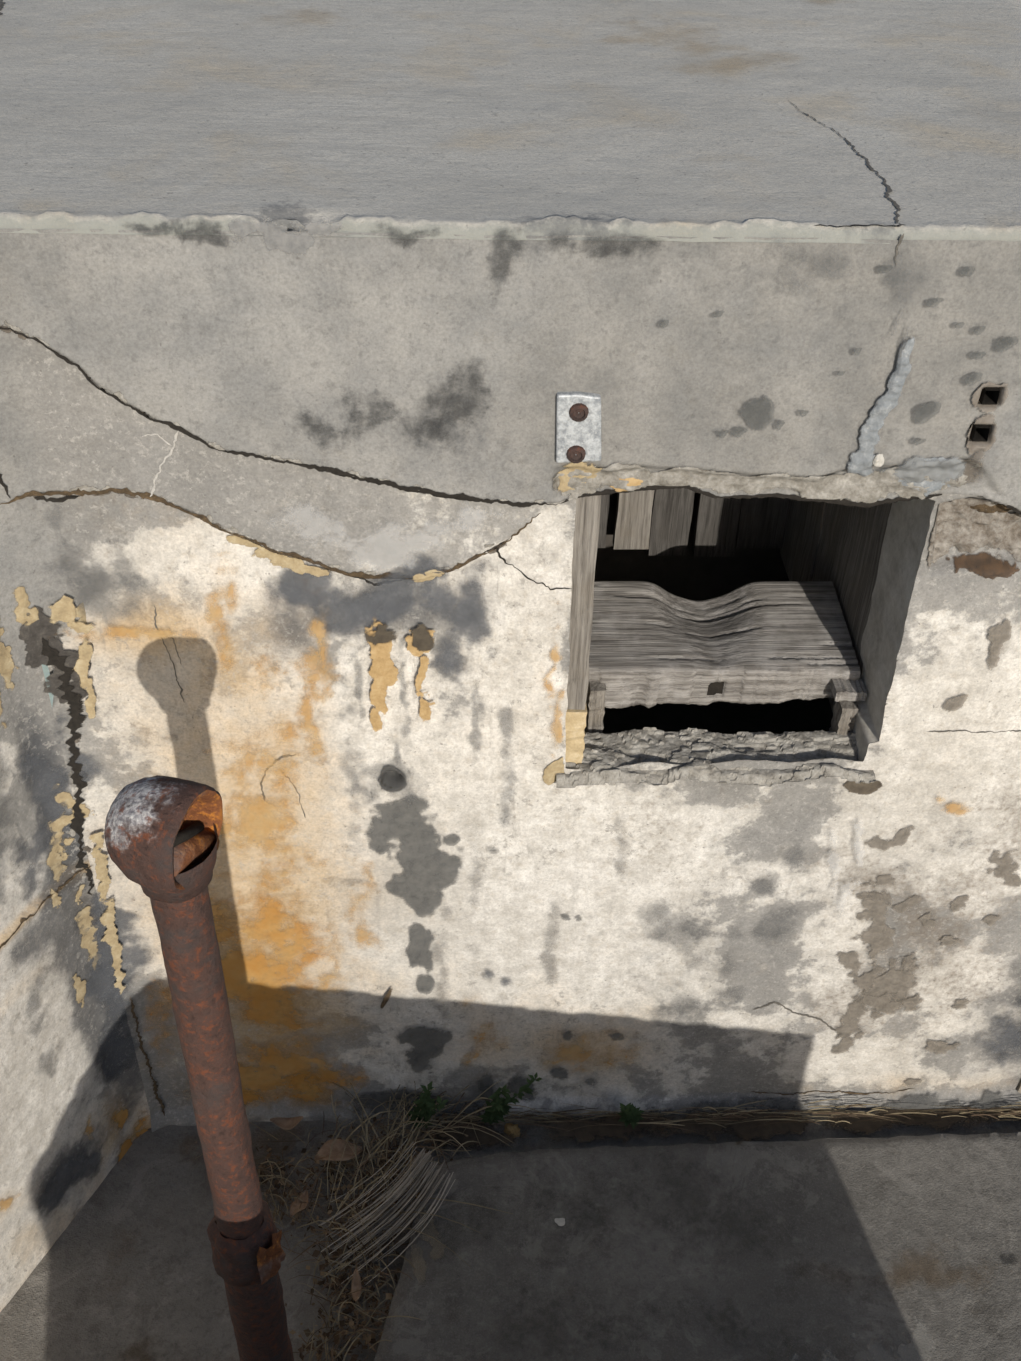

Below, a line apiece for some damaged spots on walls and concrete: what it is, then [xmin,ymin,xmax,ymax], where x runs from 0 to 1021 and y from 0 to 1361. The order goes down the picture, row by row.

crack [788,100,904,267]
crack [0,320,942,590]
spalling [553,457,1021,580]
crack [1006,505,1021,515]
spalling [0,587,96,728]
rust [284,621,329,755]
water stain [277,556,491,673]
peeling [46,784,126,1008]
rust [210,753,364,1105]
water stain [367,796,462,995]
water stain [398,1023,452,1074]
rust [257,1230,286,1285]